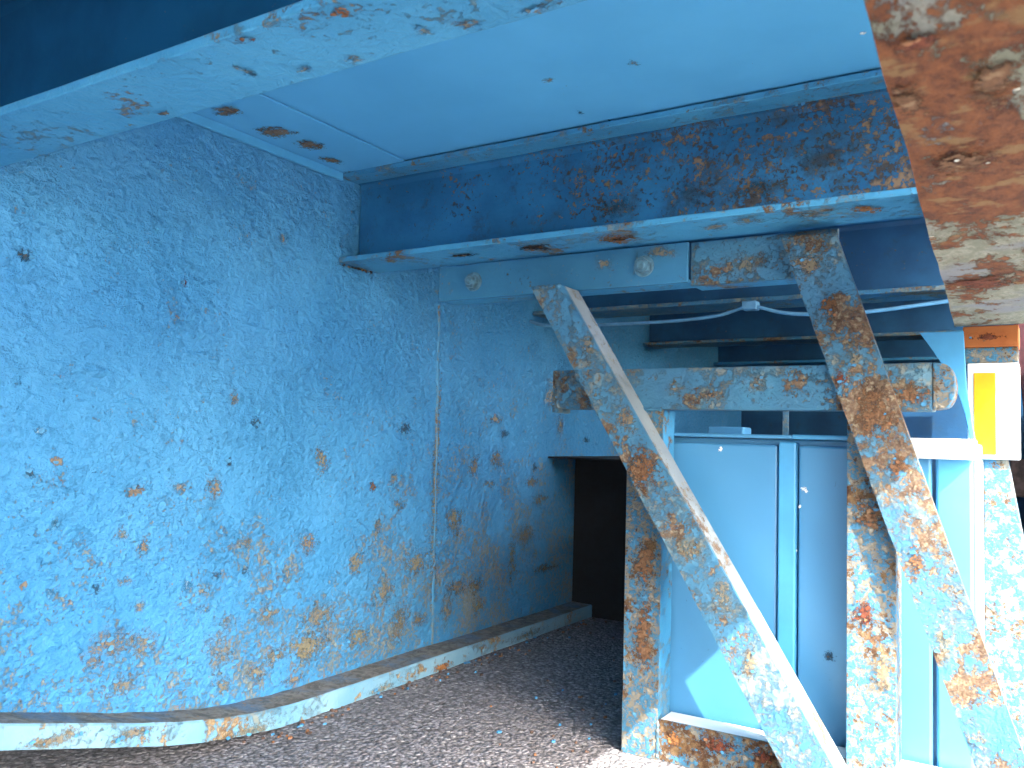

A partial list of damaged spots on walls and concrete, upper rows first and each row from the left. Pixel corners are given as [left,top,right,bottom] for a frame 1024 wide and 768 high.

corrosion [330,7,352,18]
corrosion [400,357,465,587]
corrosion [616,405,664,497]
corrosion [835,346,932,481]
corrosion [855,498,885,530]
corrosion [904,544,927,582]
corrosion [77,626,159,669]
corrosion [205,617,236,694]
corrosion [247,601,369,683]
corrosion [627,531,658,686]
corrosion [852,599,873,630]
corrosion [667,731,776,768]